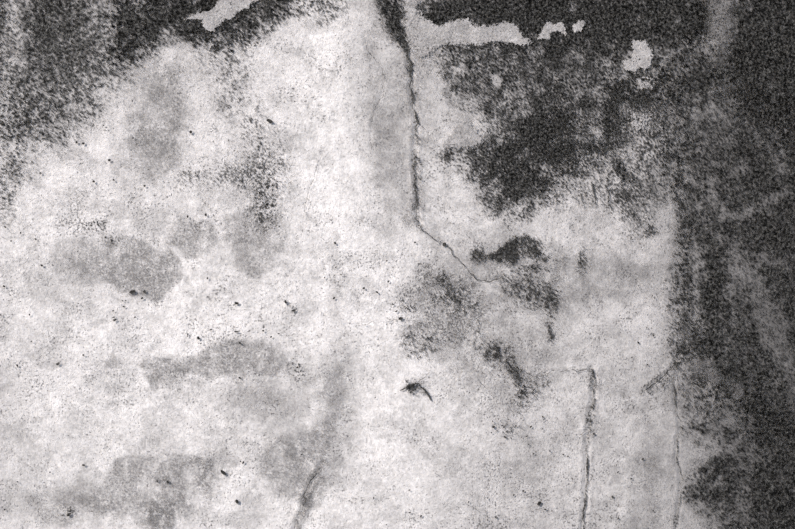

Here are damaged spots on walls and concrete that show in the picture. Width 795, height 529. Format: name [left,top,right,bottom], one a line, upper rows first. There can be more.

peeling [187,0,259,32]
peeling [403,0,585,58]
water stain [0,0,347,229]
peeling [443,120,484,152]
crack [392,34,600,529]
water stain [374,0,795,529]
water stain [59,455,213,529]